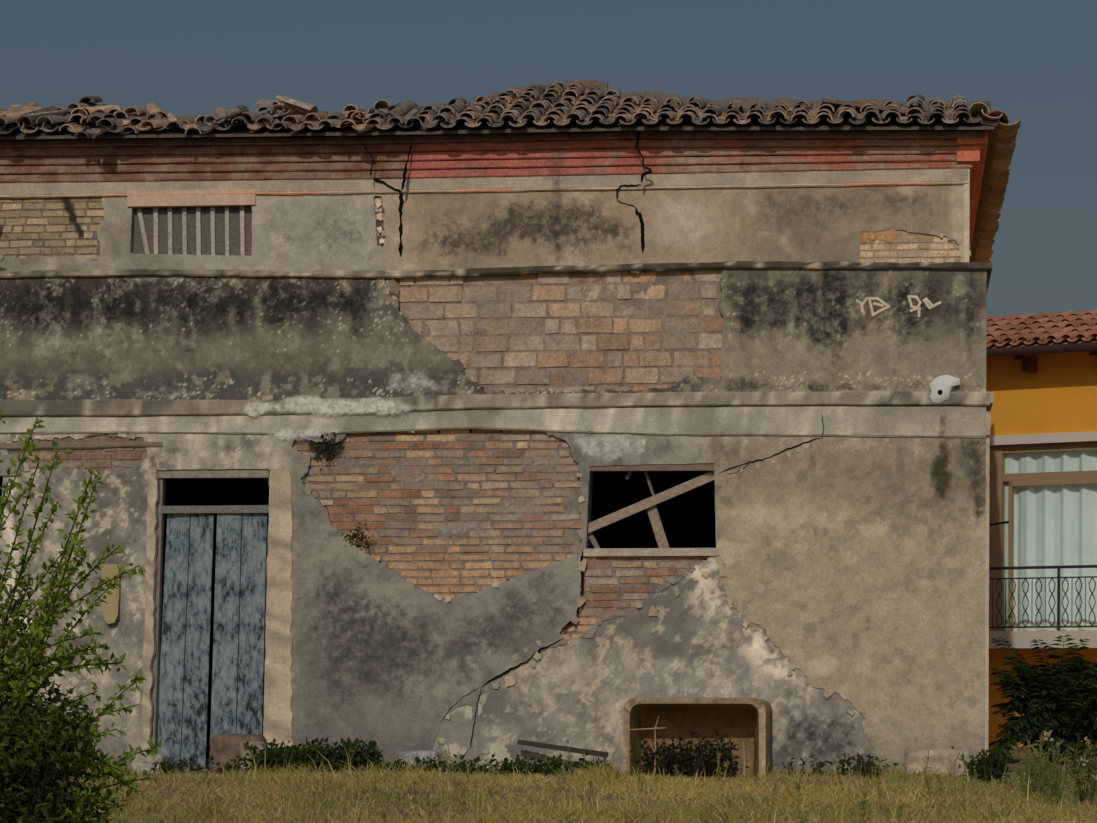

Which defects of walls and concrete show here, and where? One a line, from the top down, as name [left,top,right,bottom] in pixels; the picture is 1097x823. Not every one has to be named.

flaking render [0,197,104,260]
crack [363,143,413,256]
crack [616,123,652,252]
flaking render [860,229,971,263]
flaking render [390,269,724,394]
water stain [735,272,850,344]
water stain [897,285,924,334]
crack [721,414,824,474]
water stain [931,441,950,498]
water stain [962,441,984,516]
flaking render [244,372,875,774]
crack [441,551,584,748]